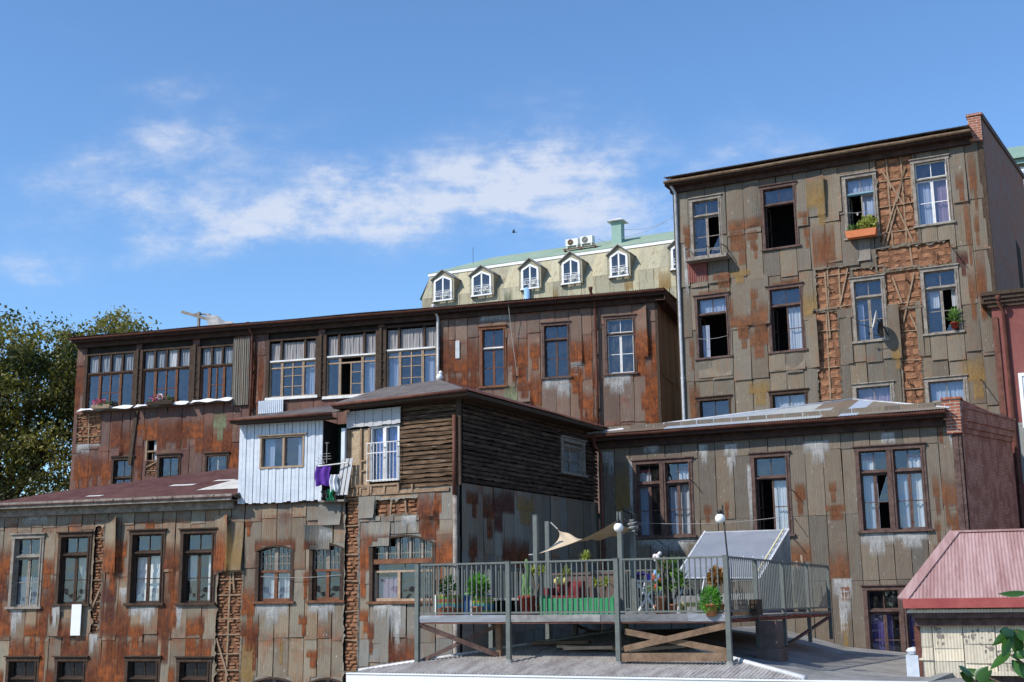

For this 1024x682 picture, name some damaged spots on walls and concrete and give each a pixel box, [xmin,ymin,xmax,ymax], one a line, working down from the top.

rust [798,188,835,266]
rust [955,160,987,319]
rust [699,218,768,357]
rust [635,331,659,424]
rust [73,459,112,489]
rust [110,422,239,481]
rust [417,493,452,589]
rust [467,491,534,579]
water stain [805,440,828,460]
rust [826,483,845,520]
rust [0,541,211,682]
water stain [834,578,851,631]